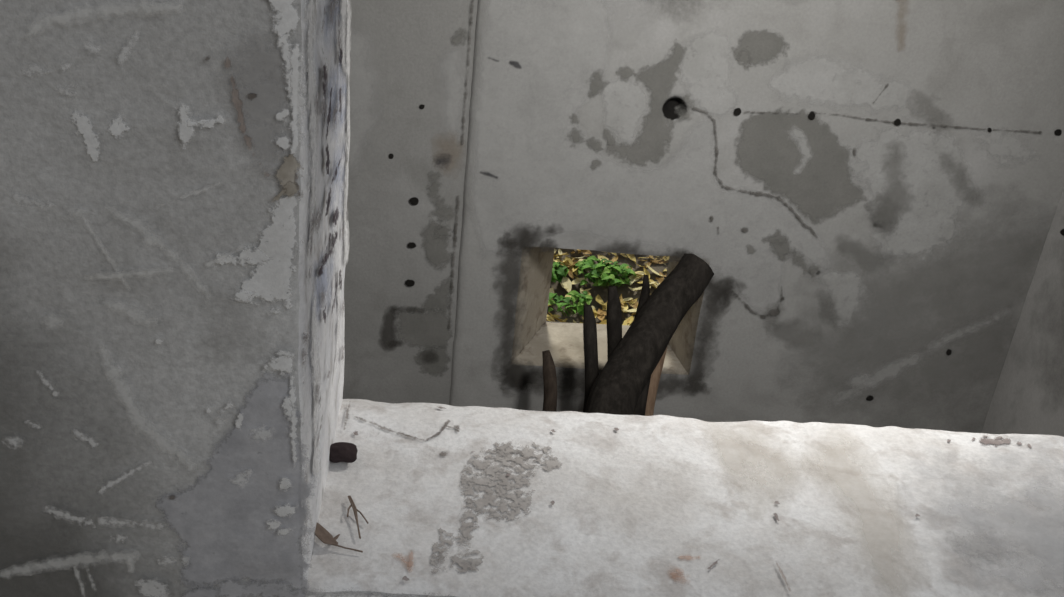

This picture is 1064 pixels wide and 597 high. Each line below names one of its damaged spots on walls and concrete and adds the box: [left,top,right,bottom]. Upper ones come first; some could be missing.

peeling [211,0,352,315]
flaking render [570,30,785,169]
crack [693,107,816,235]
flaking render [736,110,866,223]
crack [814,112,1041,133]
peeling [262,278,345,475]
peeling [267,478,297,535]
peeling [431,442,561,573]